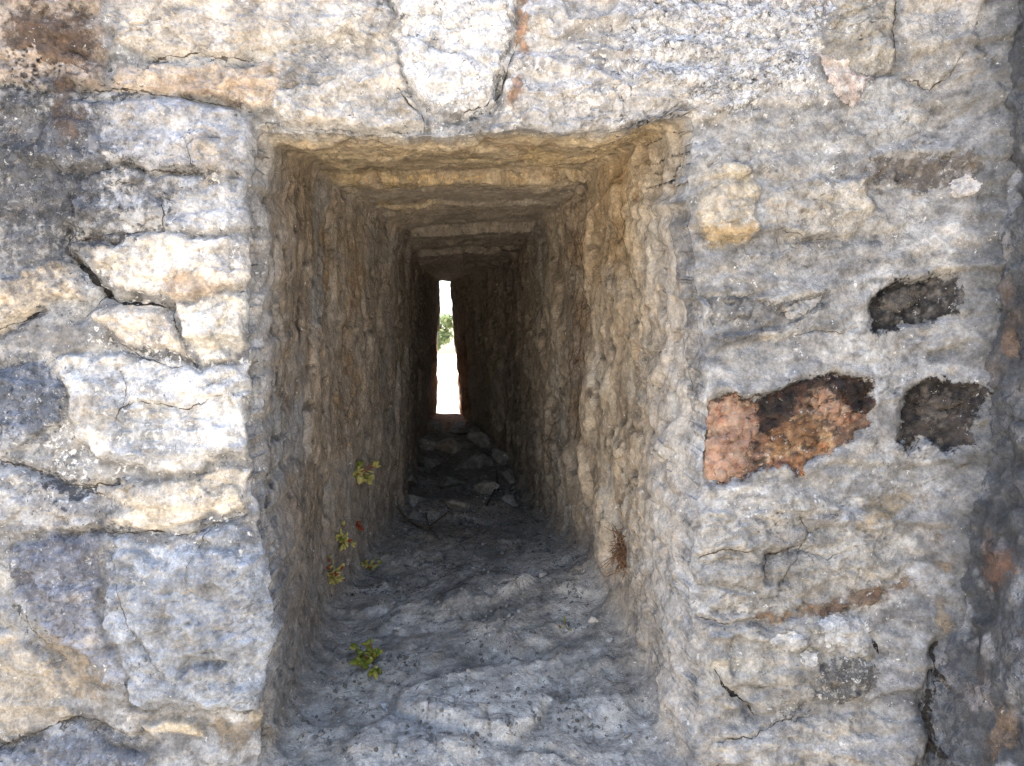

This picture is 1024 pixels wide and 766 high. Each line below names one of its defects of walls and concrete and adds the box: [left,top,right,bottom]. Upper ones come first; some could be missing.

crack [457,45,517,120]
crack [64,203,189,368]
spalling [869,271,964,337]
spalling [702,372,876,485]
spalling [896,375,993,453]
crack [699,516,847,580]
crack [918,641,959,765]